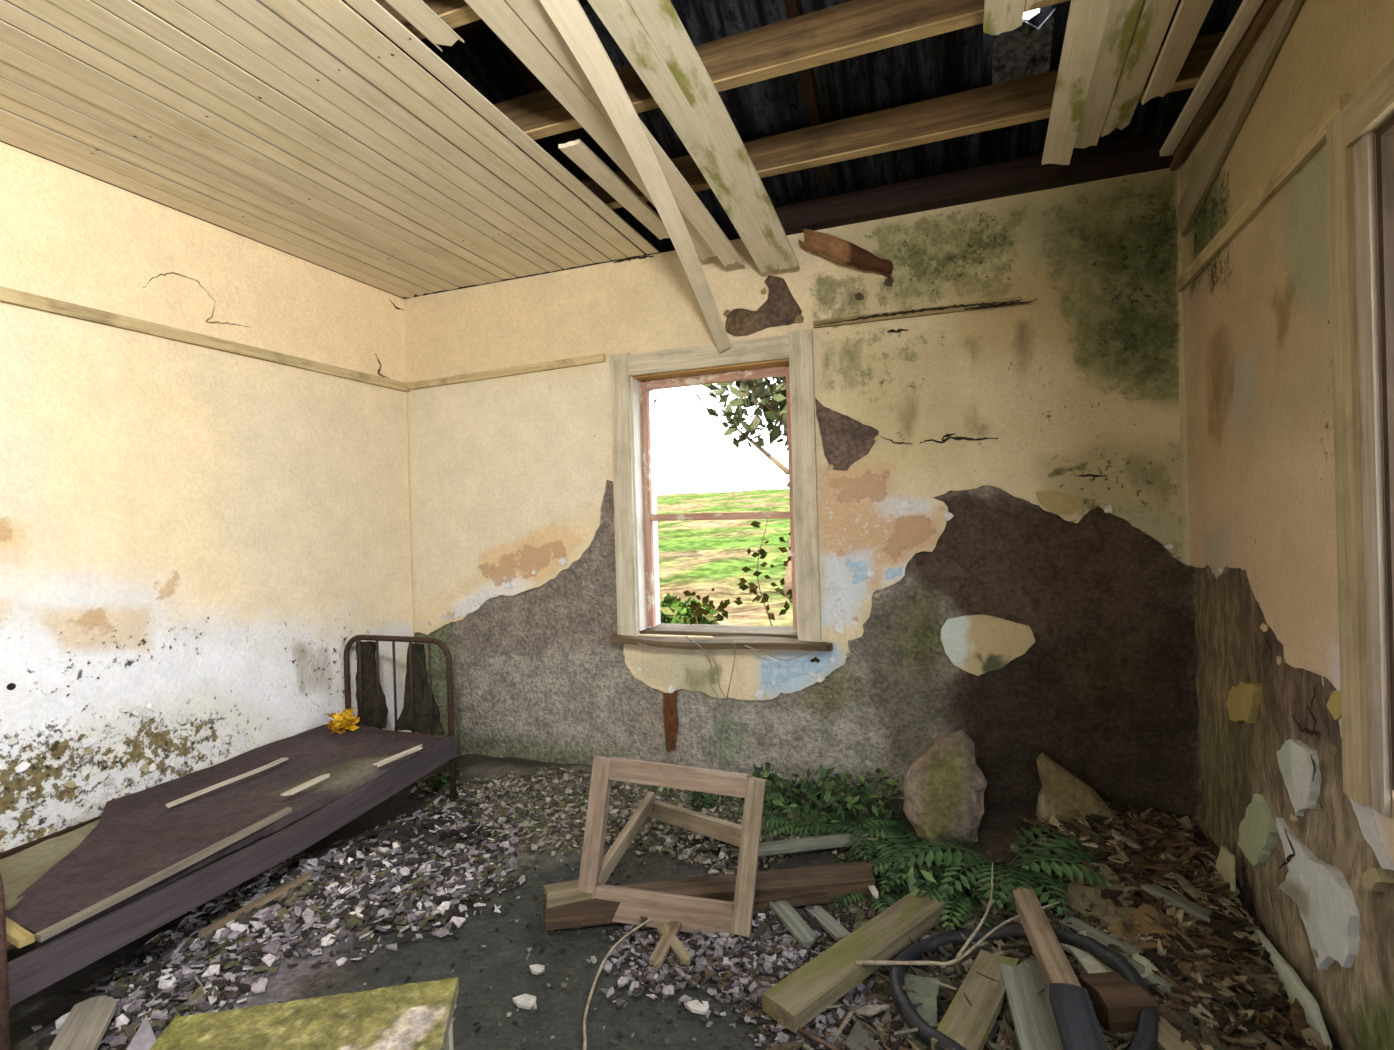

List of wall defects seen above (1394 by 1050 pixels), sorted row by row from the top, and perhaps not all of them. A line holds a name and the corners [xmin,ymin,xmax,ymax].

flaking render [798,229,893,286]
water stain [895,230,1006,277]
flaking render [723,276,804,337]
crack [816,298,1037,333]
water stain [27,617,210,696]
water stain [284,614,384,715]
flaking render [414,399,1394,1050]